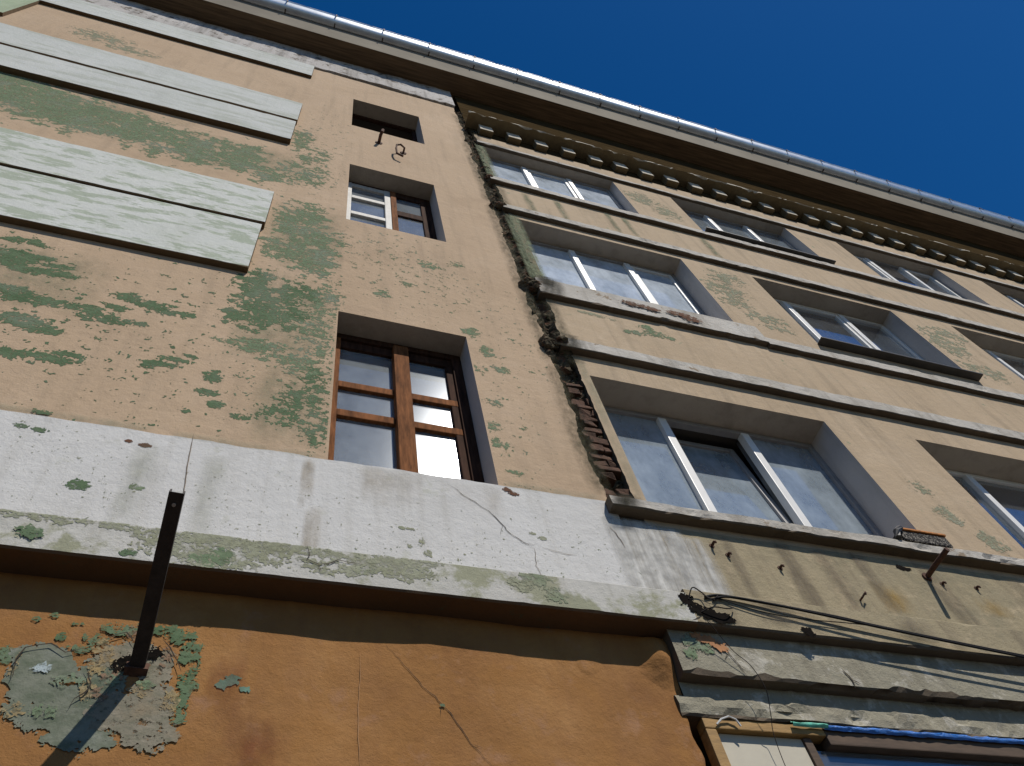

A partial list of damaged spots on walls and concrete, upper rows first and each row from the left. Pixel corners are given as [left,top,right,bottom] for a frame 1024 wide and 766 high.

peeling [0,72,553,507]
peeling [622,299,702,323]
peeling [0,496,160,556]
peeling [171,500,447,584]
crack [461,493,573,574]
peeling [681,631,730,660]
flaking render [0,622,205,758]
crack [386,645,484,757]